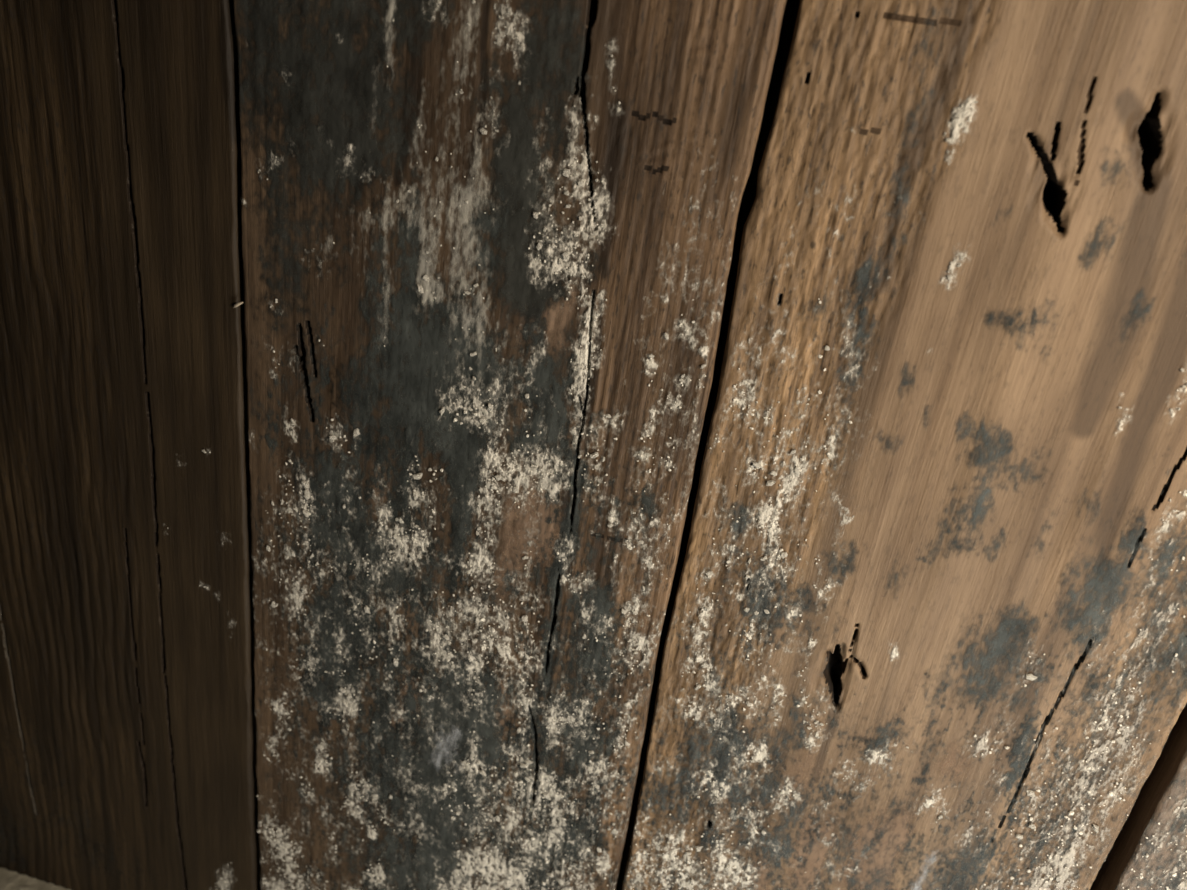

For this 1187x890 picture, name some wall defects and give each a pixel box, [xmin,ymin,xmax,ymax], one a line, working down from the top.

crack [573,0,598,231]
crack [631,110,677,126]
crack [644,165,669,175]
crack [112,0,188,890]
crack [576,289,595,459]
crack [590,532,631,542]
water stain [256,0,1187,890]
crack [1127,447,1187,568]
crack [528,712,539,803]
crack [991,639,1091,843]